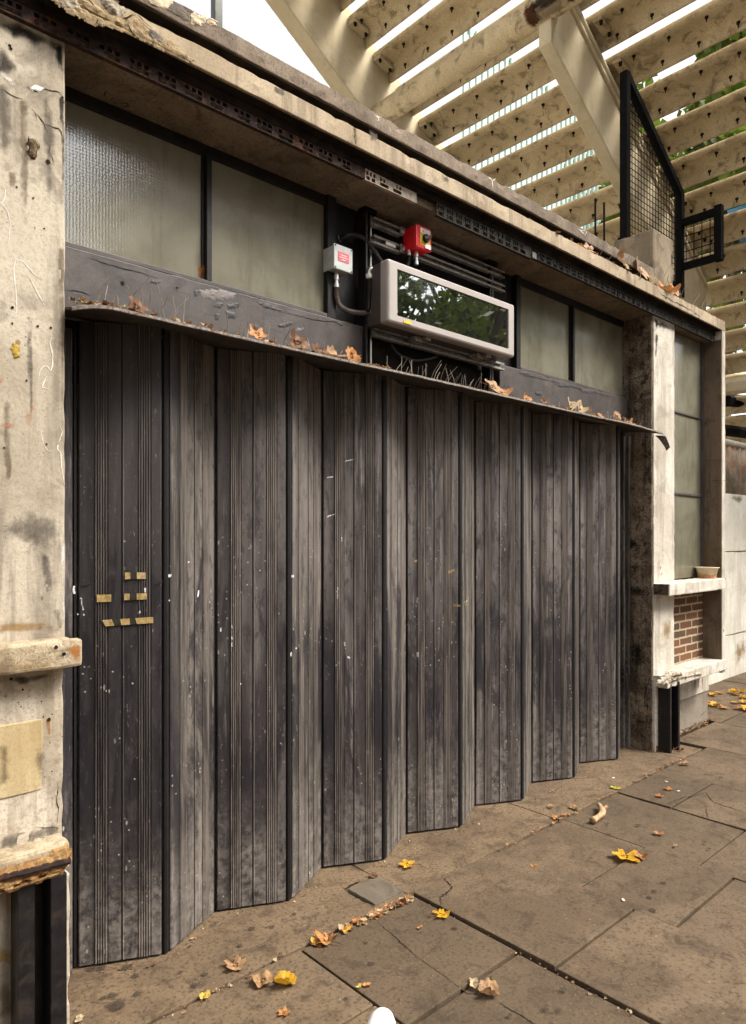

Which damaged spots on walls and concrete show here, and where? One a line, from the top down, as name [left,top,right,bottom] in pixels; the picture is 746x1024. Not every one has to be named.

flaking render [149,0,218,26]
spalling [52,0,195,63]
damp [14,519,54,543]
damp [41,556,51,600]
spalling [656,670,702,687]
spalling [0,843,72,894]
crack [434,878,453,908]